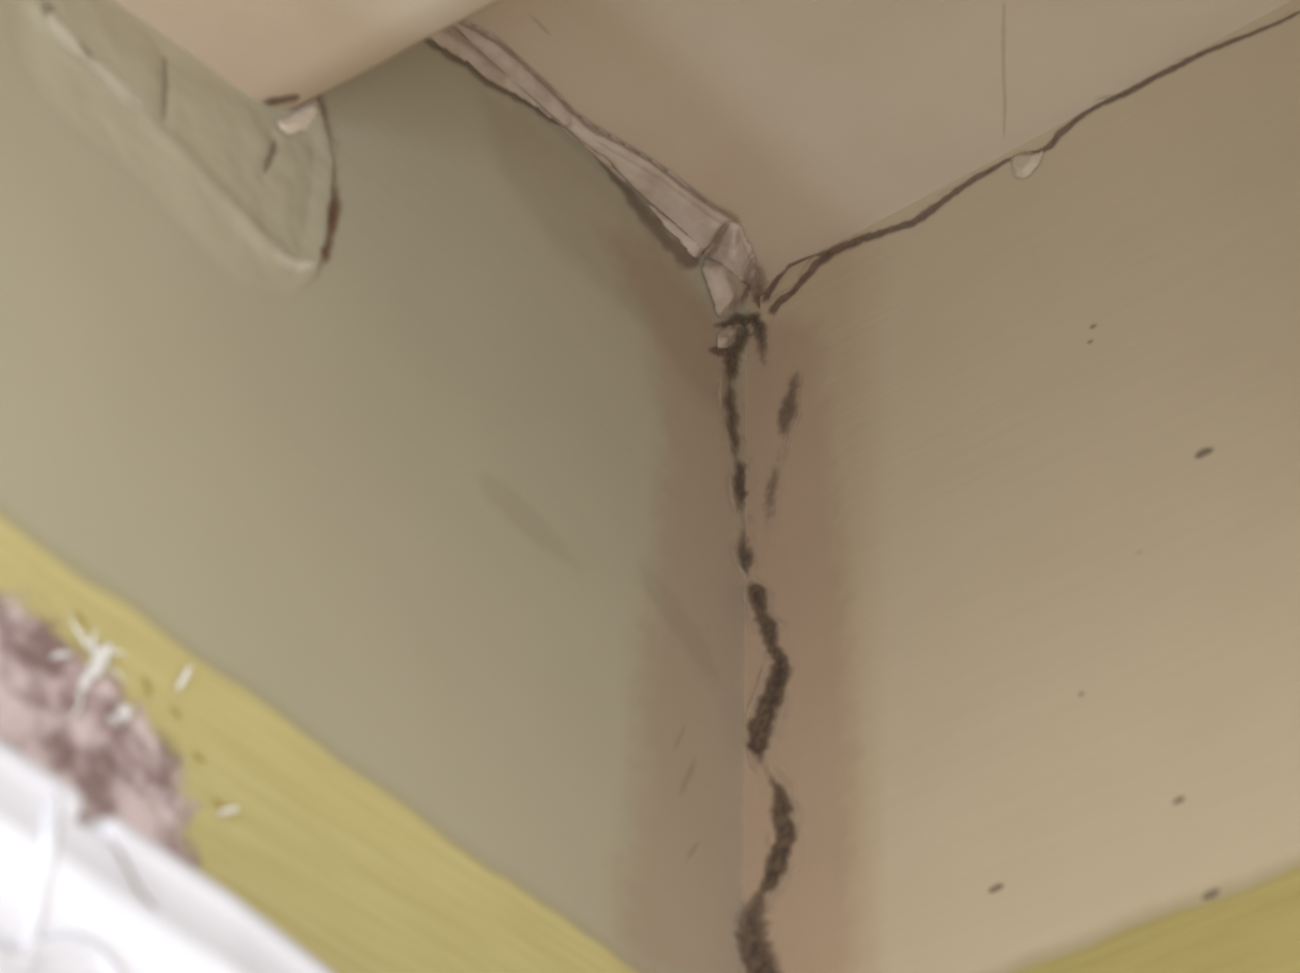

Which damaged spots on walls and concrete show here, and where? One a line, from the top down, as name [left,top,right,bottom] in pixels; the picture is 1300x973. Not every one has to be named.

flaking render [430,20,757,318]
crack [711,11,1300,505]
flaking render [0,595,204,867]
crack [738,544,796,973]